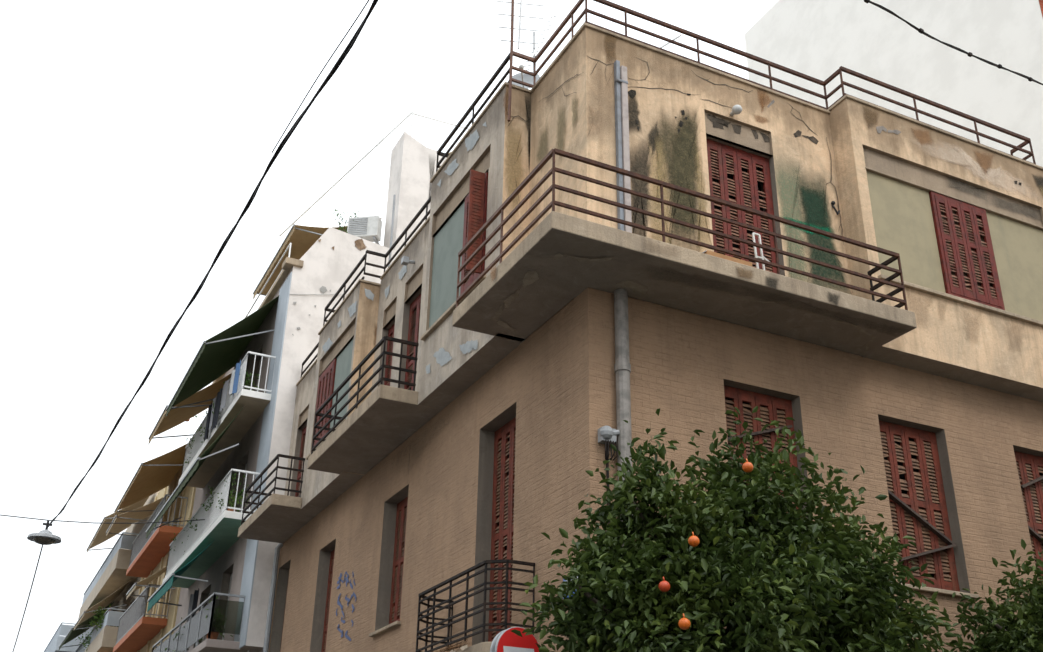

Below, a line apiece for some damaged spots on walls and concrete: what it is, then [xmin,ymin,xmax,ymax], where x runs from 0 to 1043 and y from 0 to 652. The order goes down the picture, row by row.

crack [507,57,753,129]
damp [628,97,707,246]
damp [777,171,847,305]